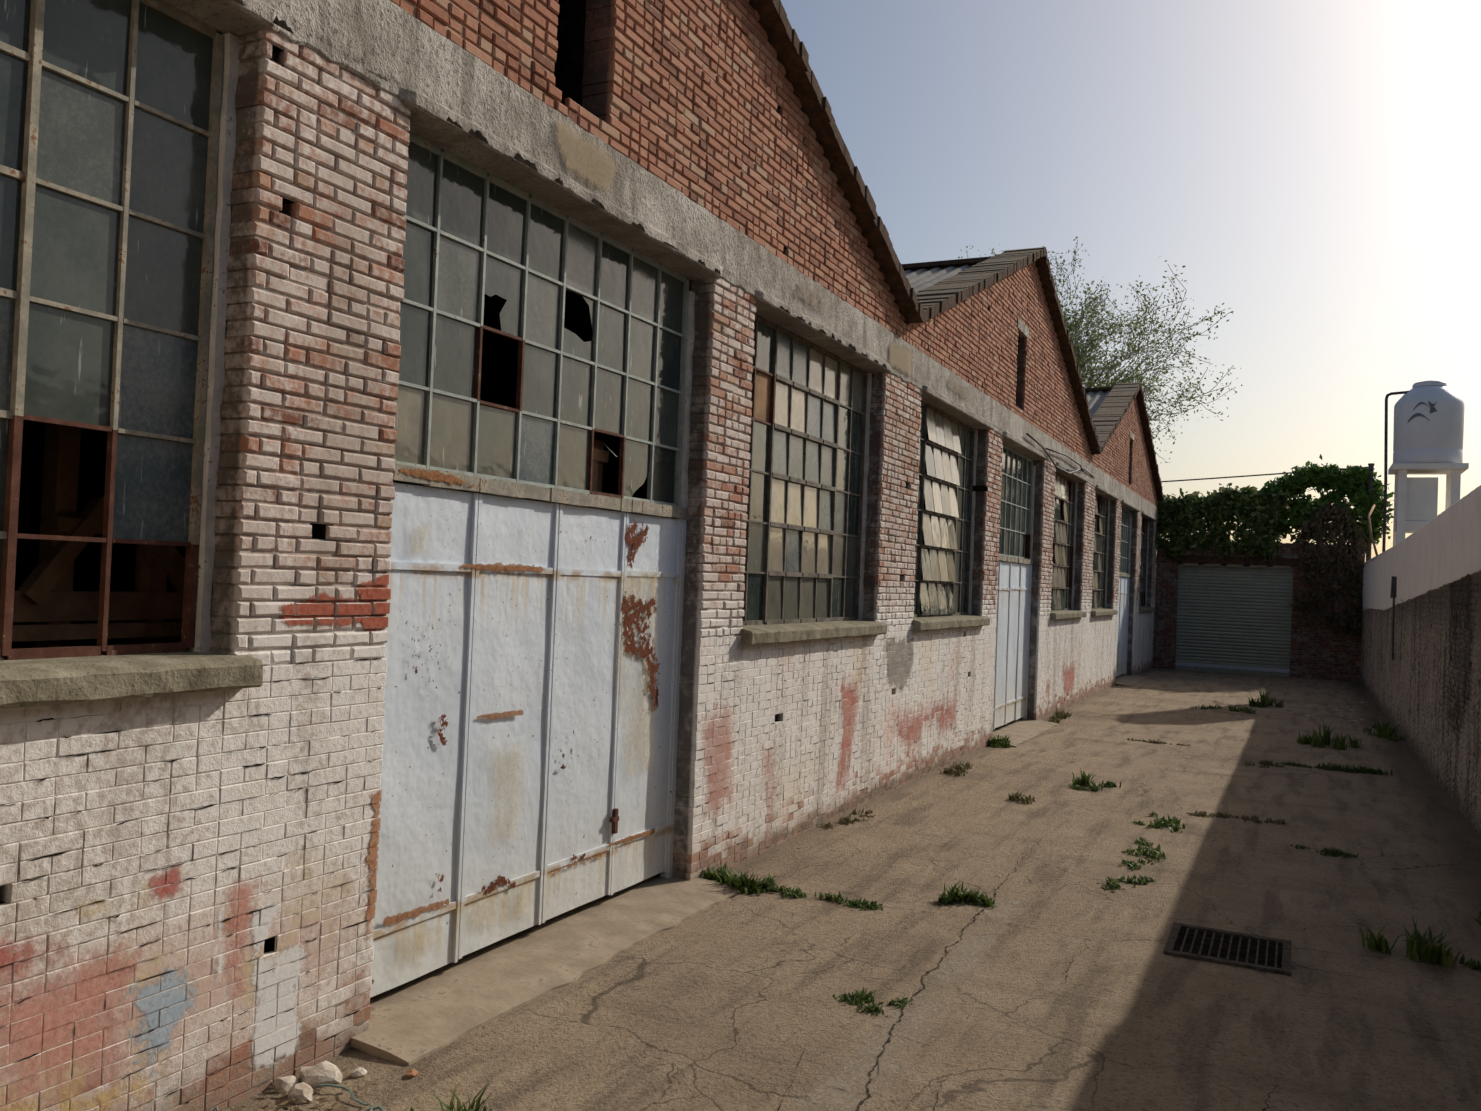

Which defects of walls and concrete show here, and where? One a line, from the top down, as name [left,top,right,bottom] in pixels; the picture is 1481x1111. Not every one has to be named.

corrosion [625,519,659,569]
peeling [279,572,391,634]
corrosion [620,591,660,712]
leakage [886,638,914,689]
corrosion [438,714,448,745]
corrosion [477,710,523,720]
corrosion [481,874,516,895]
spalling [263,936,275,953]
crack [831,838,1089,1111]
crack [750,1035,810,1111]